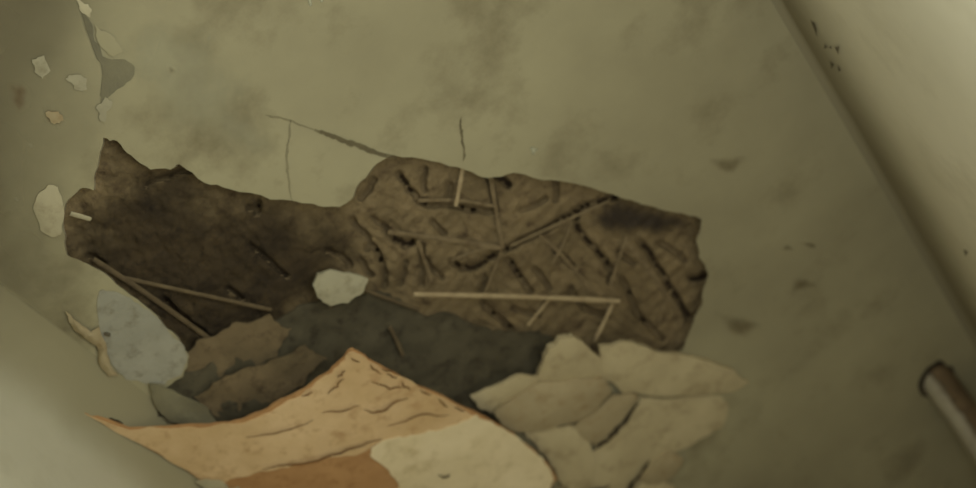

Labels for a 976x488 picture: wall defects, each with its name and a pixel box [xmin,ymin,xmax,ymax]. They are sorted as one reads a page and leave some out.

peeling [32,55,51,79]
peeling [77,0,135,123]
crack [319,130,393,158]
flaking render [33,138,749,488]